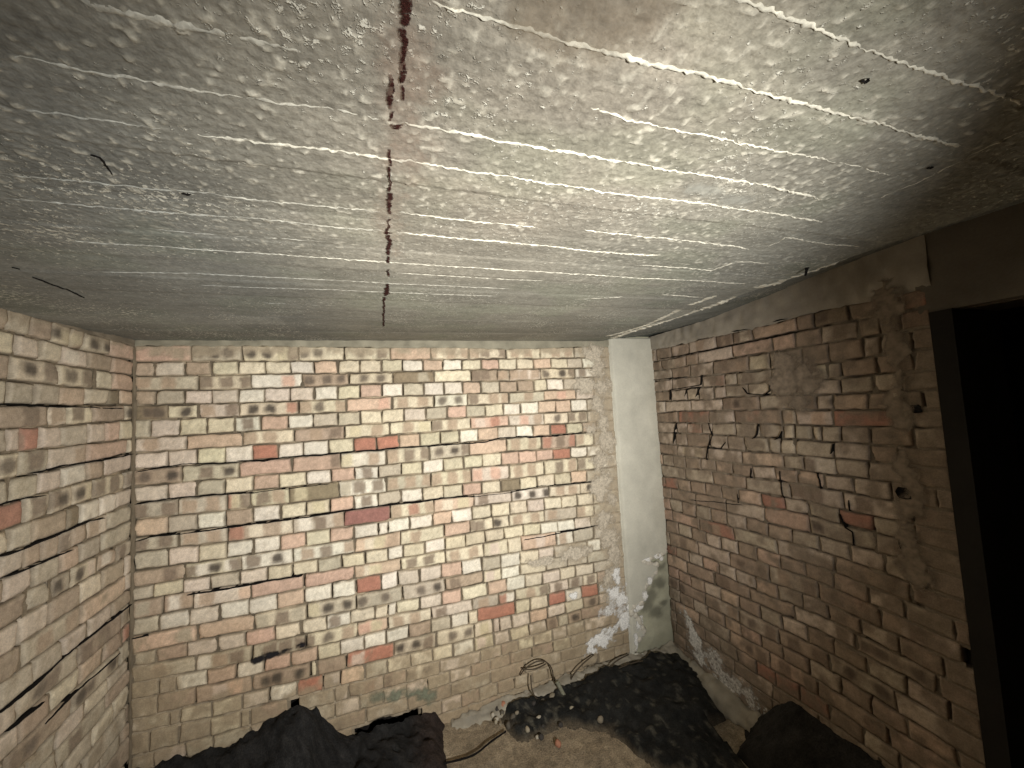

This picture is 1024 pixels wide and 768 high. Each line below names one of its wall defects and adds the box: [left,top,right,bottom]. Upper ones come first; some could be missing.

rust [387,0,413,130]
crack [90,154,113,176]
rust [382,149,394,326]
crack [0,402,124,410]
crack [706,423,726,460]
crack [657,319,798,444]
crack [0,517,105,577]
crack [187,573,303,596]
leakage [586,568,643,654]
crack [839,500,855,545]
crack [0,604,149,732]
leakage [684,607,767,713]